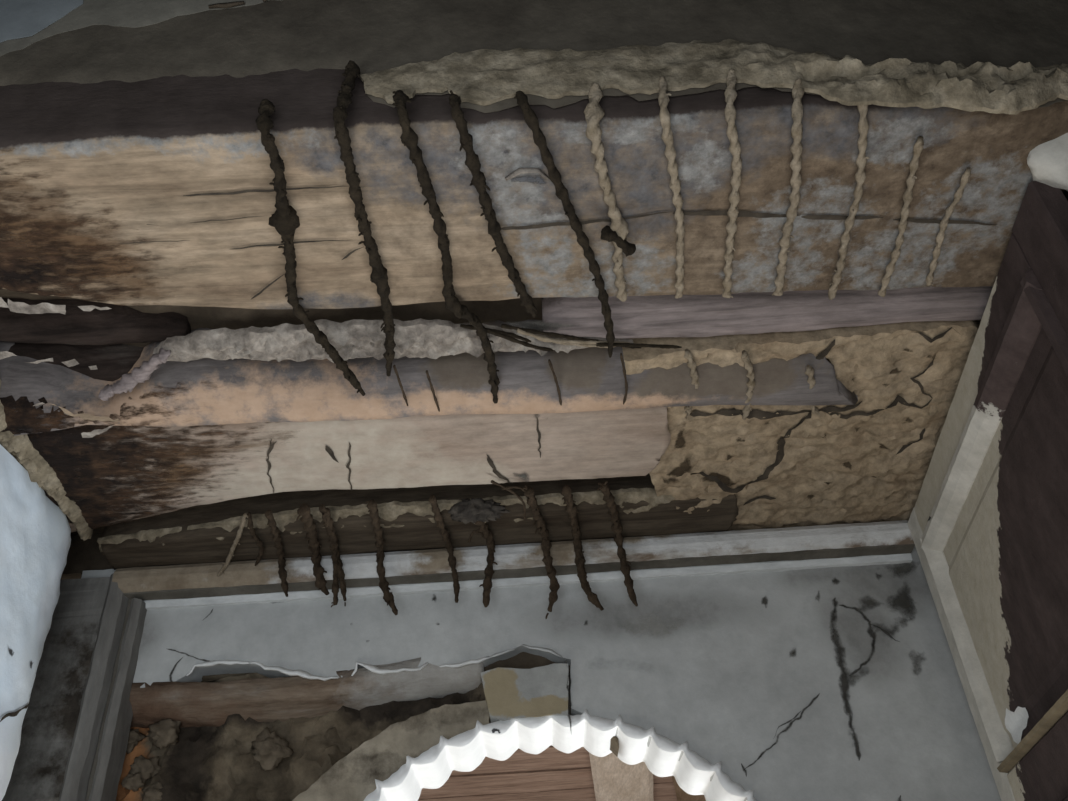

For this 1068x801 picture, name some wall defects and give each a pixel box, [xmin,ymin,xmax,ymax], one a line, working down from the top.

spalling [0,0,1068,115]
leakage [0,159,161,306]
spalling [0,401,93,541]
peeling [0,351,97,370]
peeling [0,297,112,314]
peeling [33,402,119,438]
spalling [153,318,633,363]
crack [690,327,961,505]
spalling [116,644,571,801]
spalling [610,736,619,757]
crack [741,598,896,777]
peeling [1005,706,1029,744]